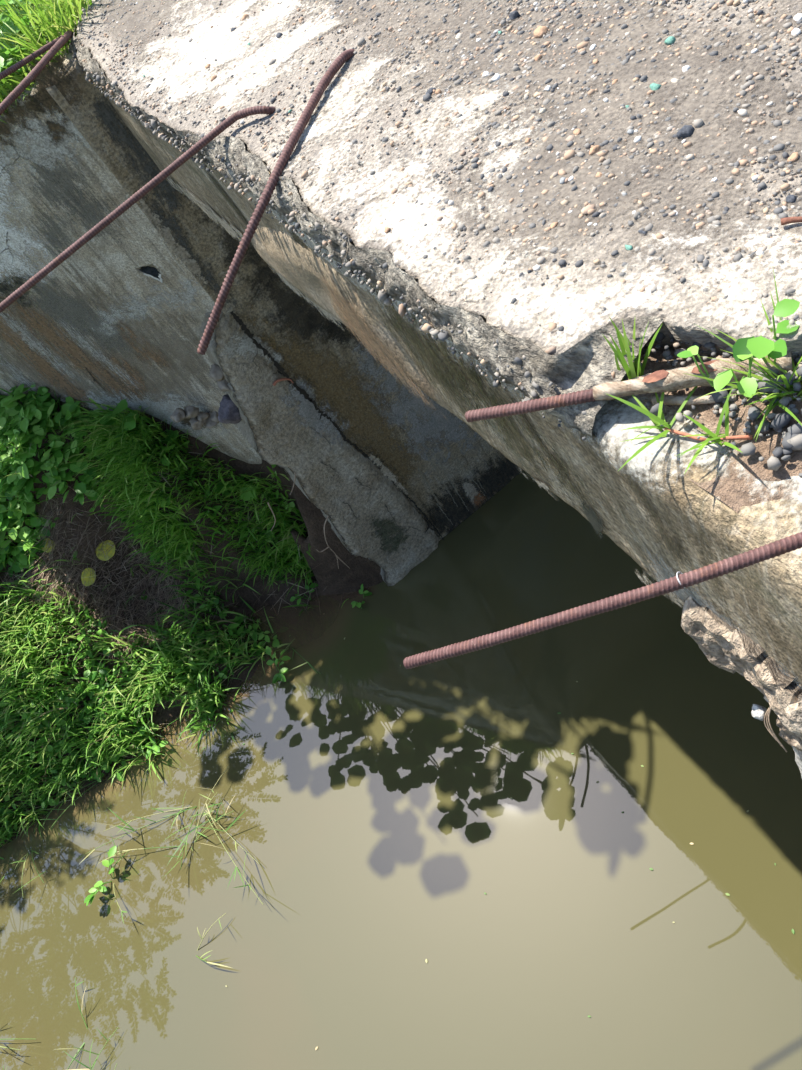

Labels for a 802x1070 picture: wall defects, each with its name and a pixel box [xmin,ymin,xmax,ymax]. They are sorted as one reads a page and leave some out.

water stain [0,97,607,539]
spalling [0,25,664,439]
crack [230,311,444,540]
spalling [462,482,484,506]
water stain [587,398,744,582]
water stain [756,476,802,519]
spalling [403,532,802,761]